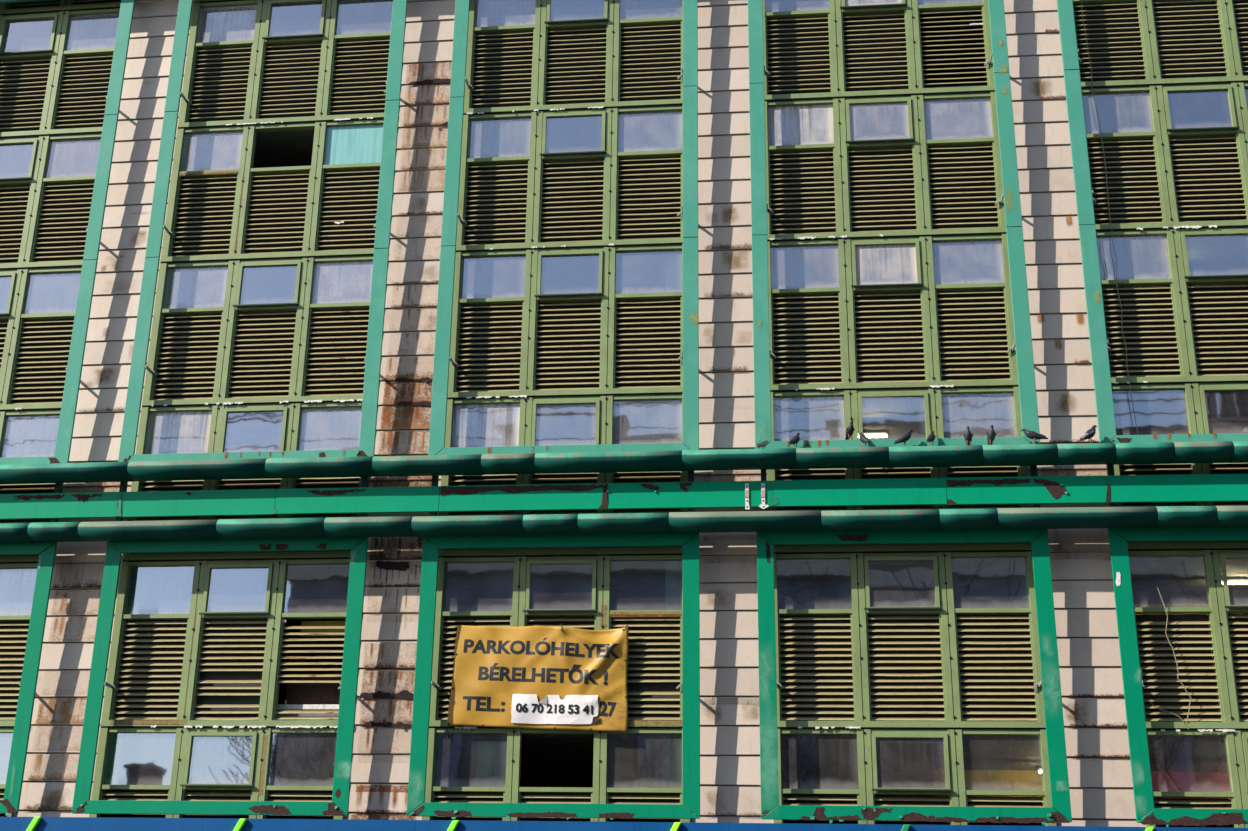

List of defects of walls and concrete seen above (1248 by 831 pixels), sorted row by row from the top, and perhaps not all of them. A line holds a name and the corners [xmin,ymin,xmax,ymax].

rust [399,61,451,215]
rust [393,280,439,318]
rust [379,355,433,456]
peeling [14,494,102,503]
peeling [440,484,608,509]
peeling [946,478,1068,505]
rust [369,537,423,623]
rust [360,643,415,743]
rust [351,785,415,820]
peeling [800,807,1069,825]
peeling [1141,812,1248,827]